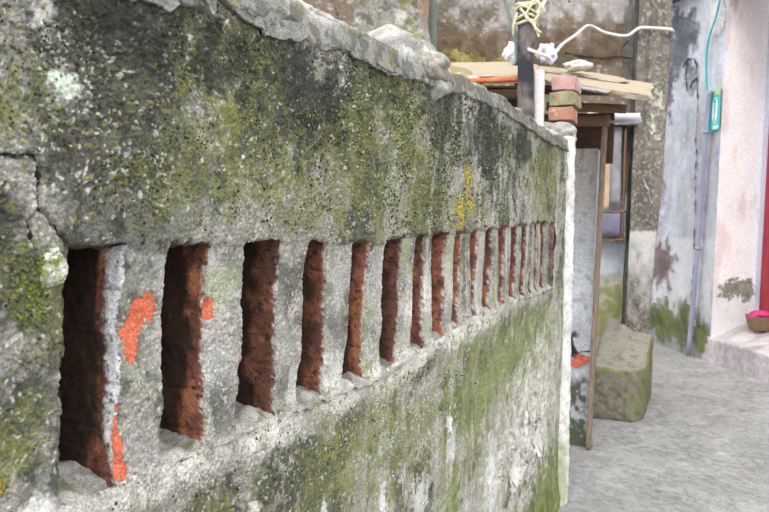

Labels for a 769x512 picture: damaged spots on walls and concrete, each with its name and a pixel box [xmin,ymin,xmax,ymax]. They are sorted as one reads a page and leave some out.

water stain [437,0,490,26]
water stain [667,7,699,123]
crack [0,153,59,240]